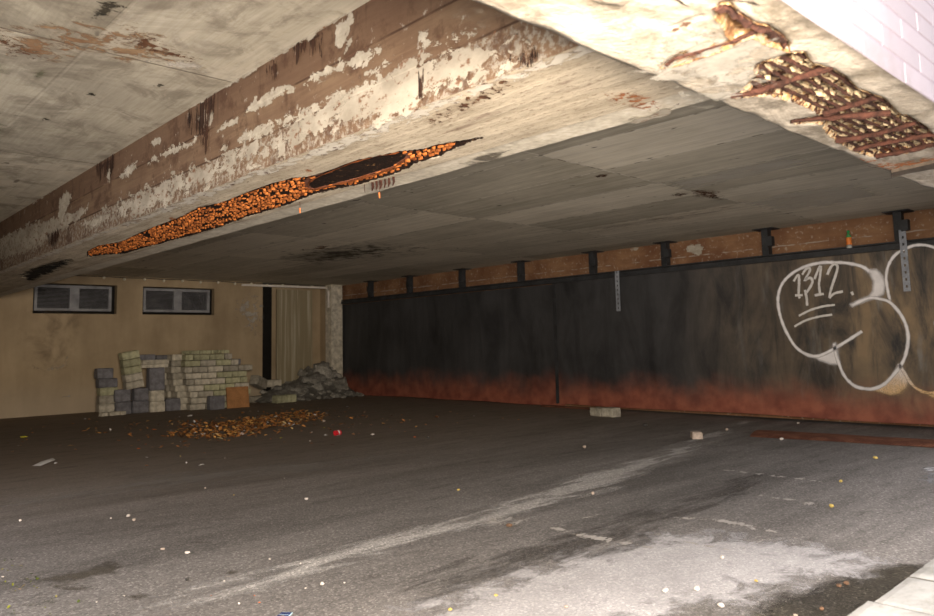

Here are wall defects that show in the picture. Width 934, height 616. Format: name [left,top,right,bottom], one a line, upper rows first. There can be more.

damp [293,33,322,63]
spalling [630,1,934,159]
damp [96,154,114,183]
damp [185,93,215,154]
spalling [0,12,594,274]
peeling [891,159,934,178]